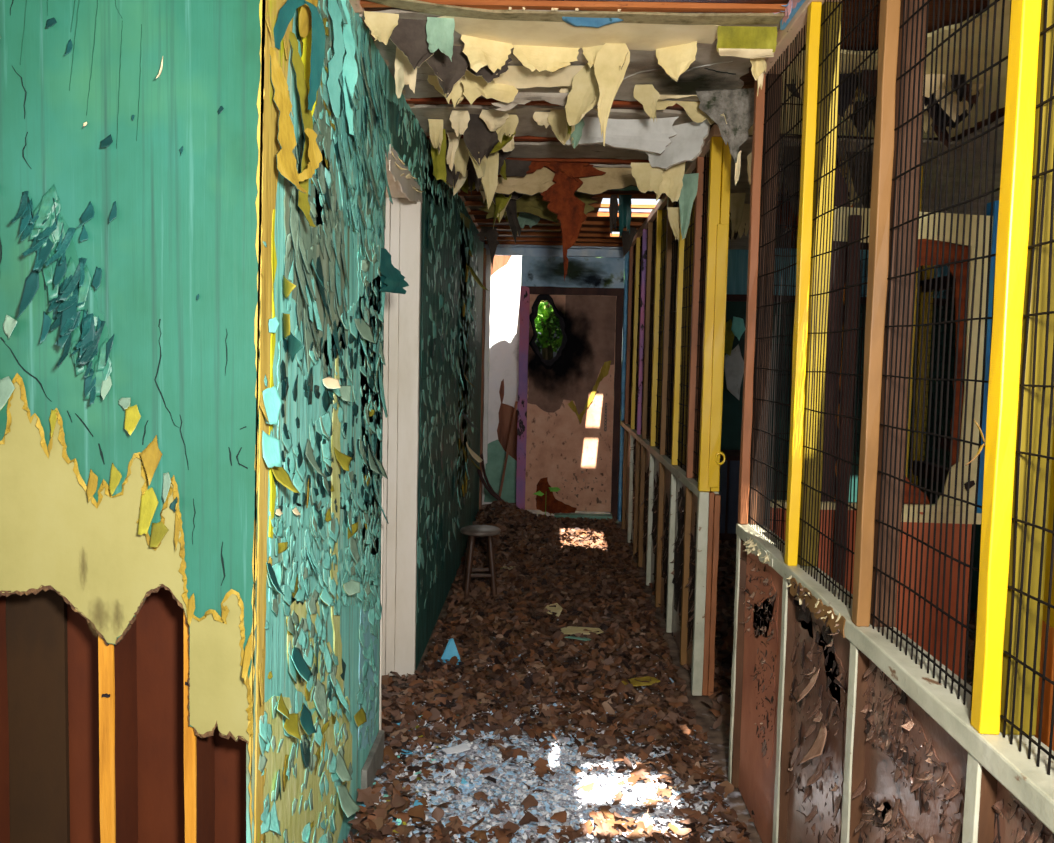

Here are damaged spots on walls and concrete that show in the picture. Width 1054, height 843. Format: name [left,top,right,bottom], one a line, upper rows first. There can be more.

crack [10,0,48,168]
crack [69,0,142,149]
leakage [542,260,609,286]
crack [142,319,189,470]
peeling [0,0,489,843]
peeling [739,537,965,843]
peeling [992,799,1054,843]